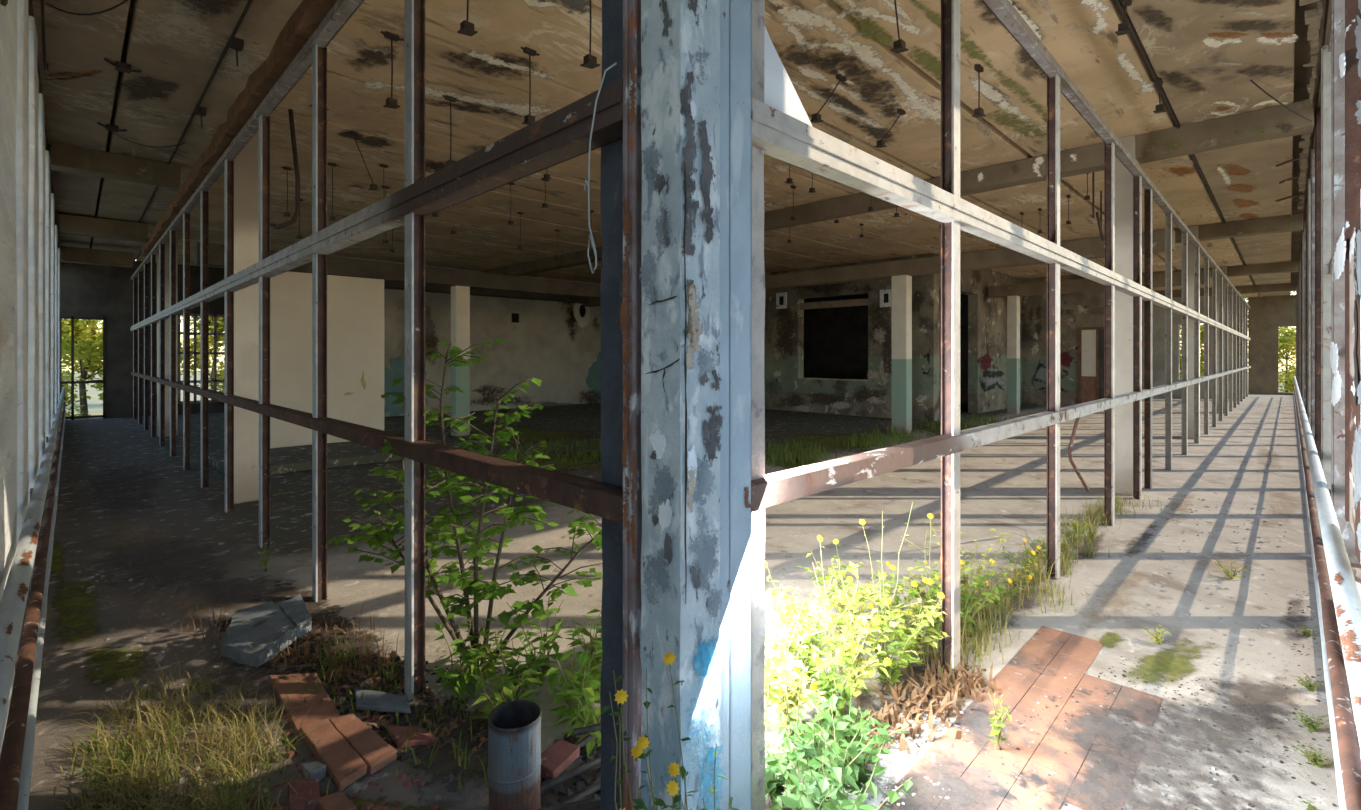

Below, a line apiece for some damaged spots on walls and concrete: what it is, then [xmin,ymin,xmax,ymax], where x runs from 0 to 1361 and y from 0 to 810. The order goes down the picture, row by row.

water stain [425,50,555,117]
water stain [777,0,941,142]
water stain [1199,0,1298,78]
peeling [638,52,716,302]
spalling [1334,227,1361,305]
water stain [795,282,892,373]
rust [619,199,637,582]
peeling [1330,342,1341,406]
peeling [643,406,723,623]
peeling [1353,425,1361,551]
rust [17,521,40,602]
rust [1336,604,1361,663]